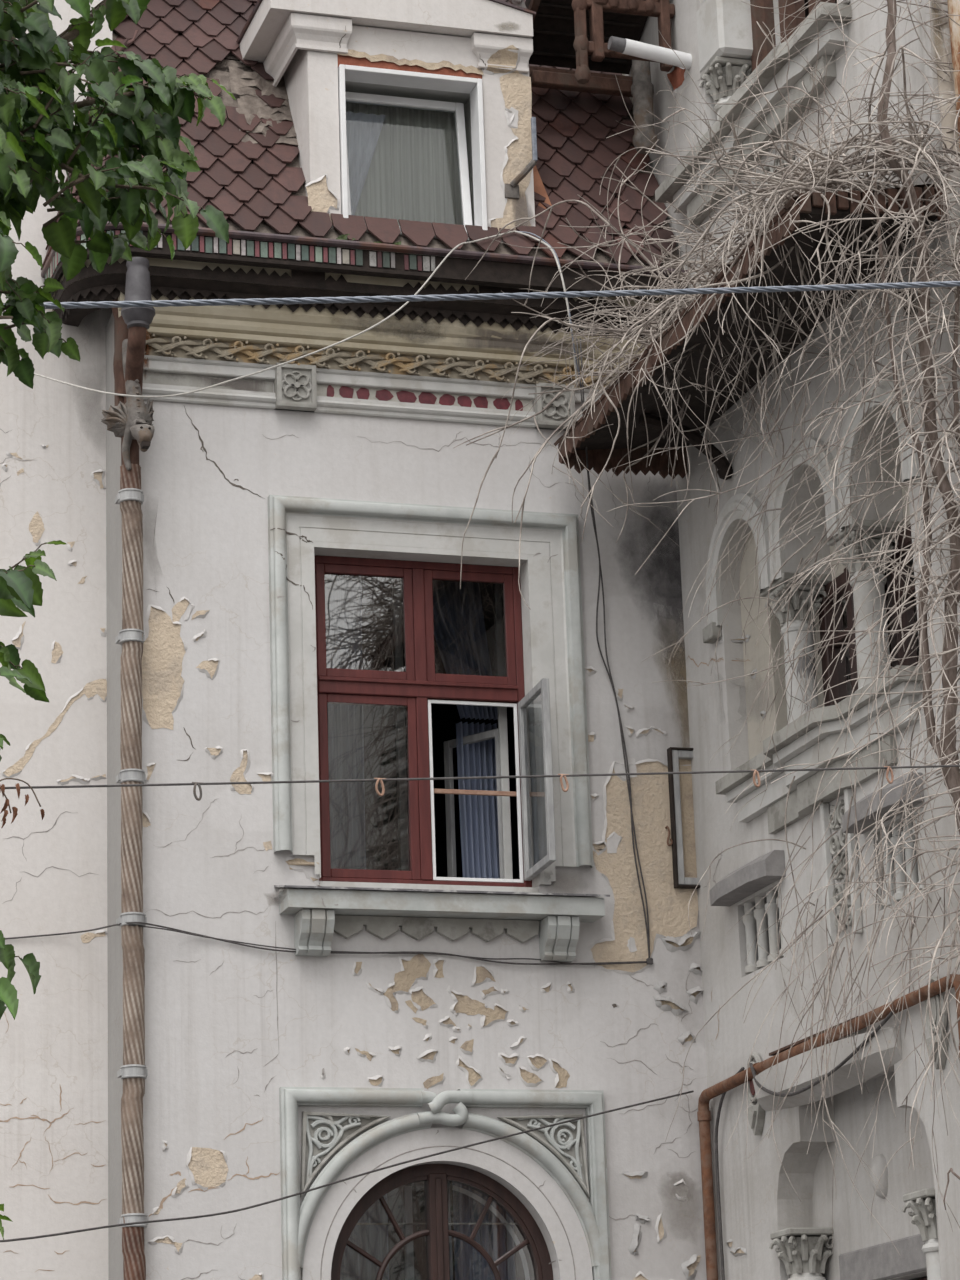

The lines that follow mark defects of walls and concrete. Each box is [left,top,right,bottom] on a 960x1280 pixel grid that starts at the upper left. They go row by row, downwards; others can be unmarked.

peeling [337,45,532,239]
crack [184,406,313,609]
damp [631,510,683,622]
peeling [1,679,107,778]
peeling [142,597,220,730]
crack [2,811,98,904]
peeling [587,758,703,1016]
crack [145,909,280,1216]
peeling [343,954,575,1089]
crack [0,1086,105,1205]
peeling [151,1147,229,1215]
crack [181,1226,245,1280]